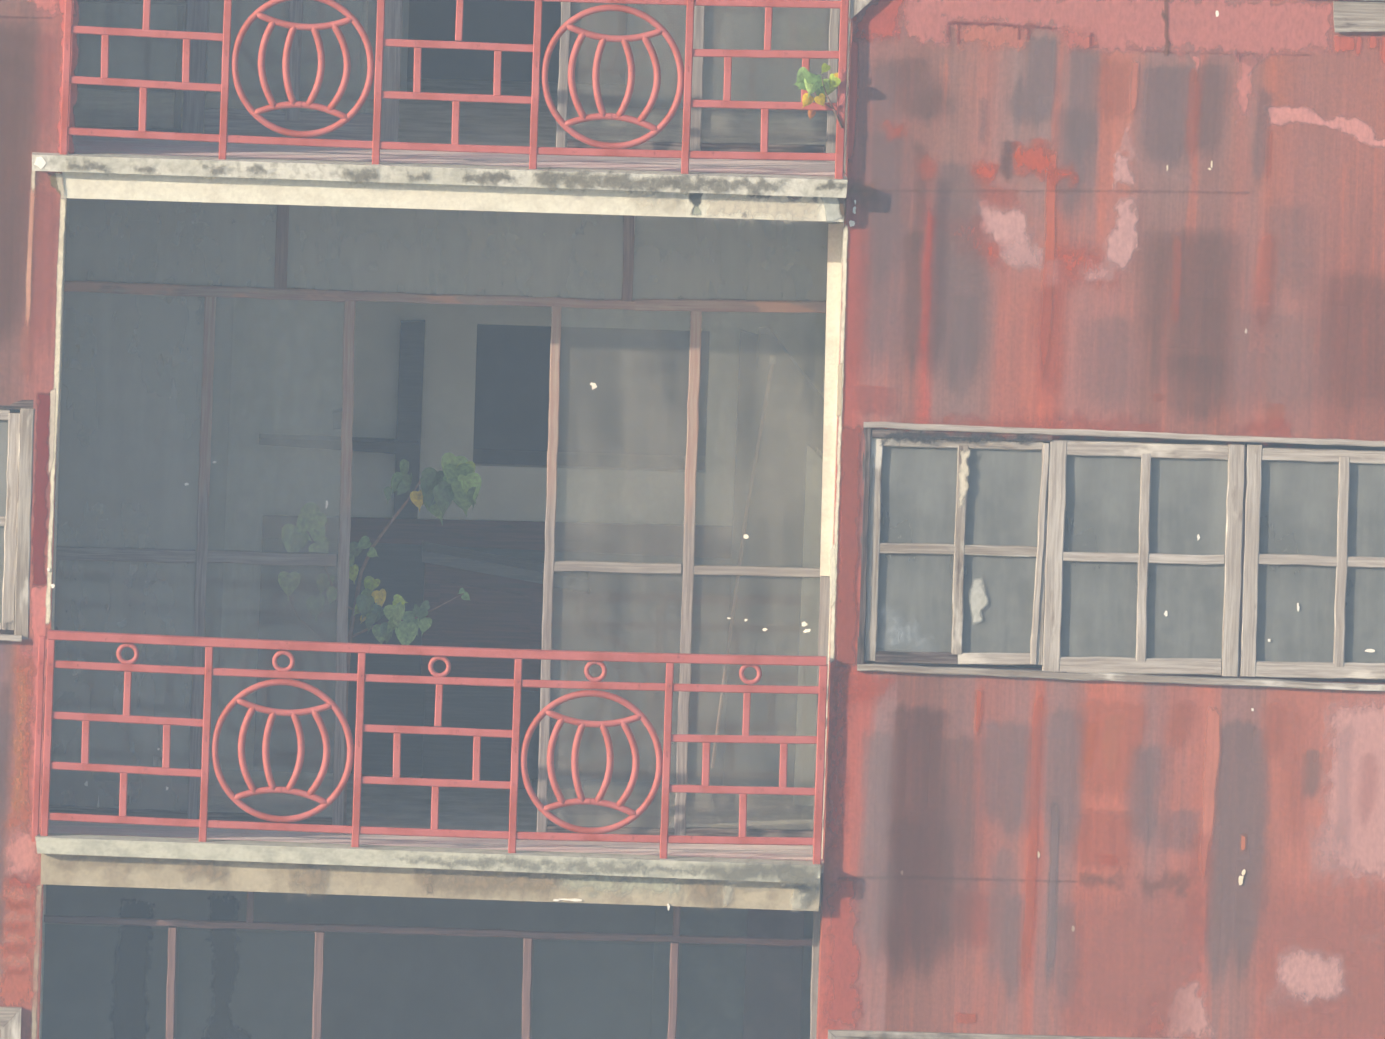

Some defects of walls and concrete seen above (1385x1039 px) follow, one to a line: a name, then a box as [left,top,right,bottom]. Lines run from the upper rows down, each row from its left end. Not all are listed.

peeling [850,0,1333,115]
peeling [1267,105,1385,147]
leakage [68,163,107,172]
leakage [342,169,378,183]
leakage [465,172,511,184]
leakage [535,169,847,216]
peeling [979,200,1044,267]
peeling [1088,154,1138,279]
leakage [416,863,820,908]
leakage [1047,803,1059,974]
peeling [1270,949,1343,1003]
leakage [1278,912,1385,1028]